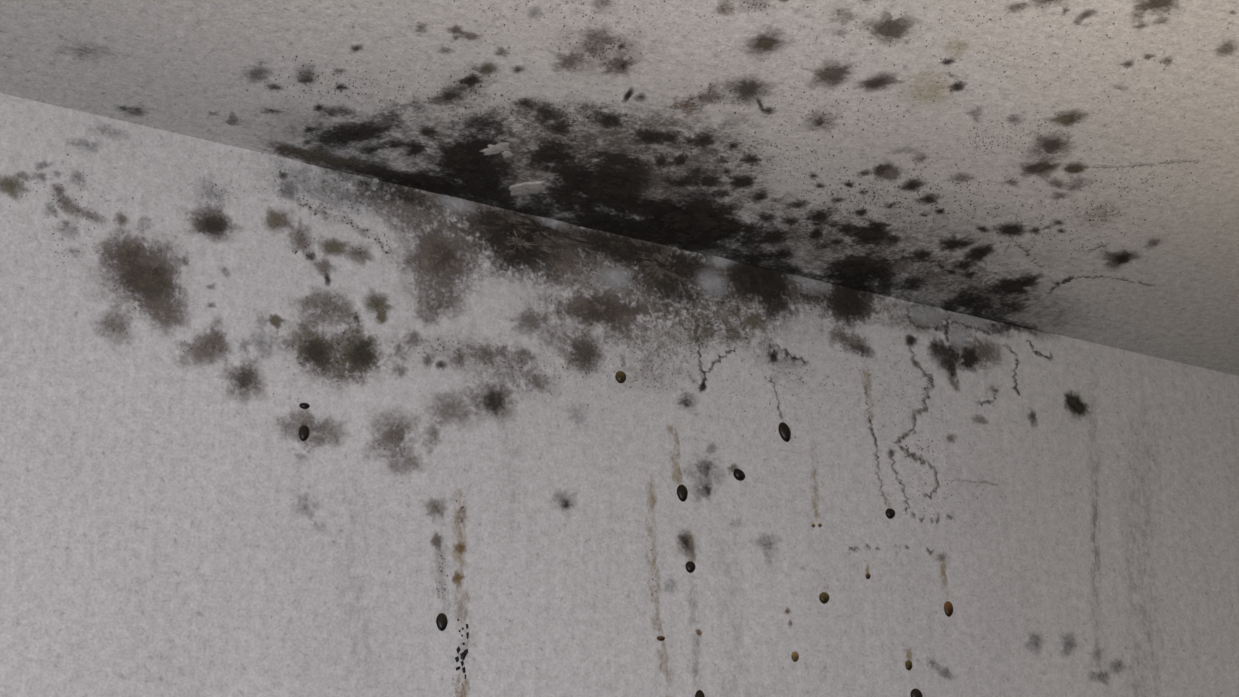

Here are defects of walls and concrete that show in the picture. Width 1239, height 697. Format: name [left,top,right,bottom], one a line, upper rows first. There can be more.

leakage [1127,0,1174,44]
leakage [0,163,127,230]
leakage [185,180,232,236]
leakage [235,0,1136,425]
leakage [103,240,187,334]
leakage [184,332,228,362]
leakage [229,366,259,393]
crack [697,339,735,391]
crack [876,316,1050,553]